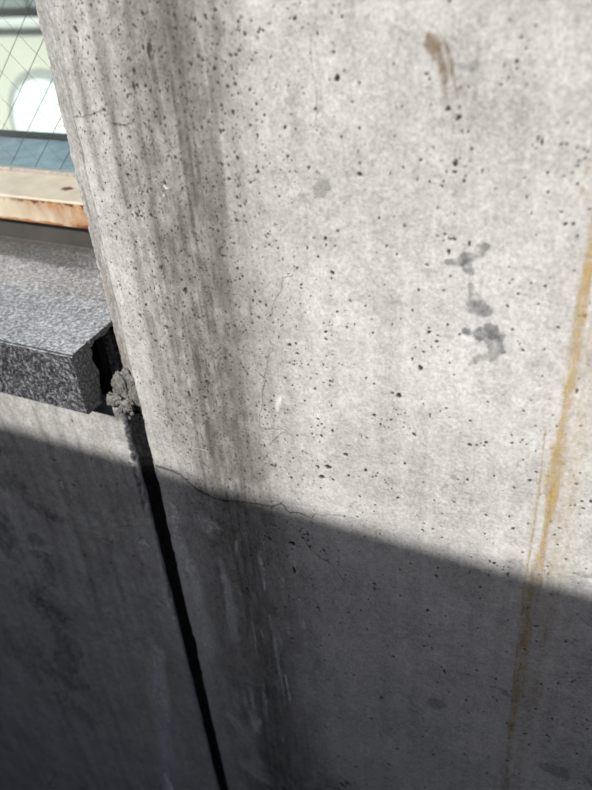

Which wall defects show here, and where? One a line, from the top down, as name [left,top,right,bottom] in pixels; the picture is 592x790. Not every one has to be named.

damp [157,130,296,790]
damp [462,302,499,341]
rust [539,476,559,528]
rust [553,245,592,467]